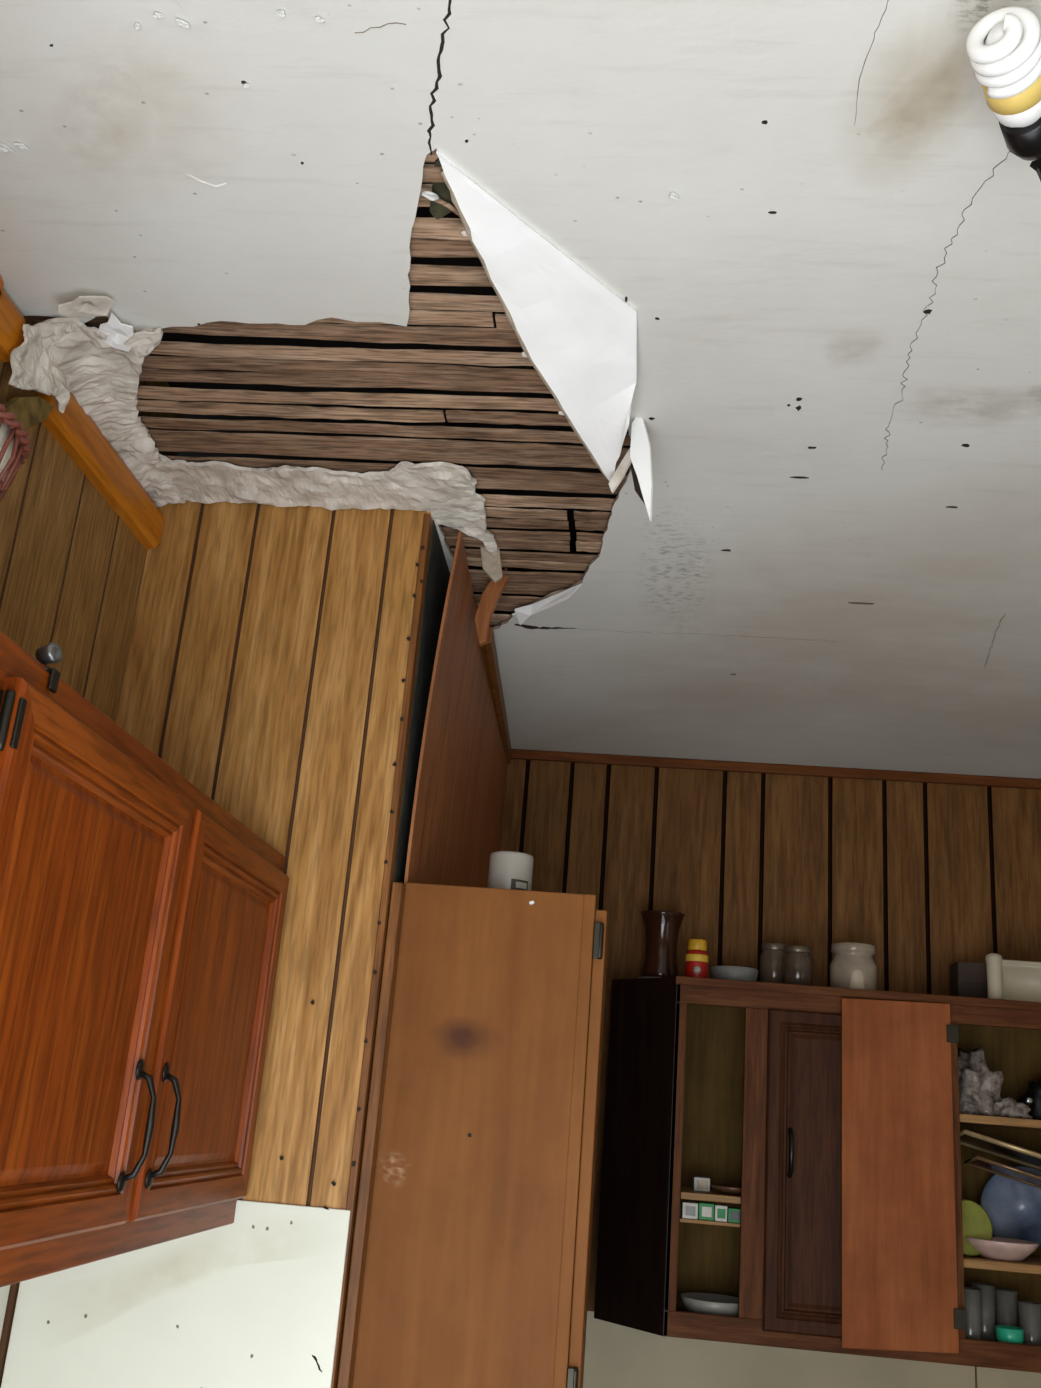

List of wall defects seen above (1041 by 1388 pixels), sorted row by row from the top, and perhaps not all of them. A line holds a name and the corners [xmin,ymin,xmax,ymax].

crack [355,22,406,33]
crack [427,0,452,156]
crack [881,151,1010,469]
flaking render [158,454,503,583]
flaking render [512,583,582,625]